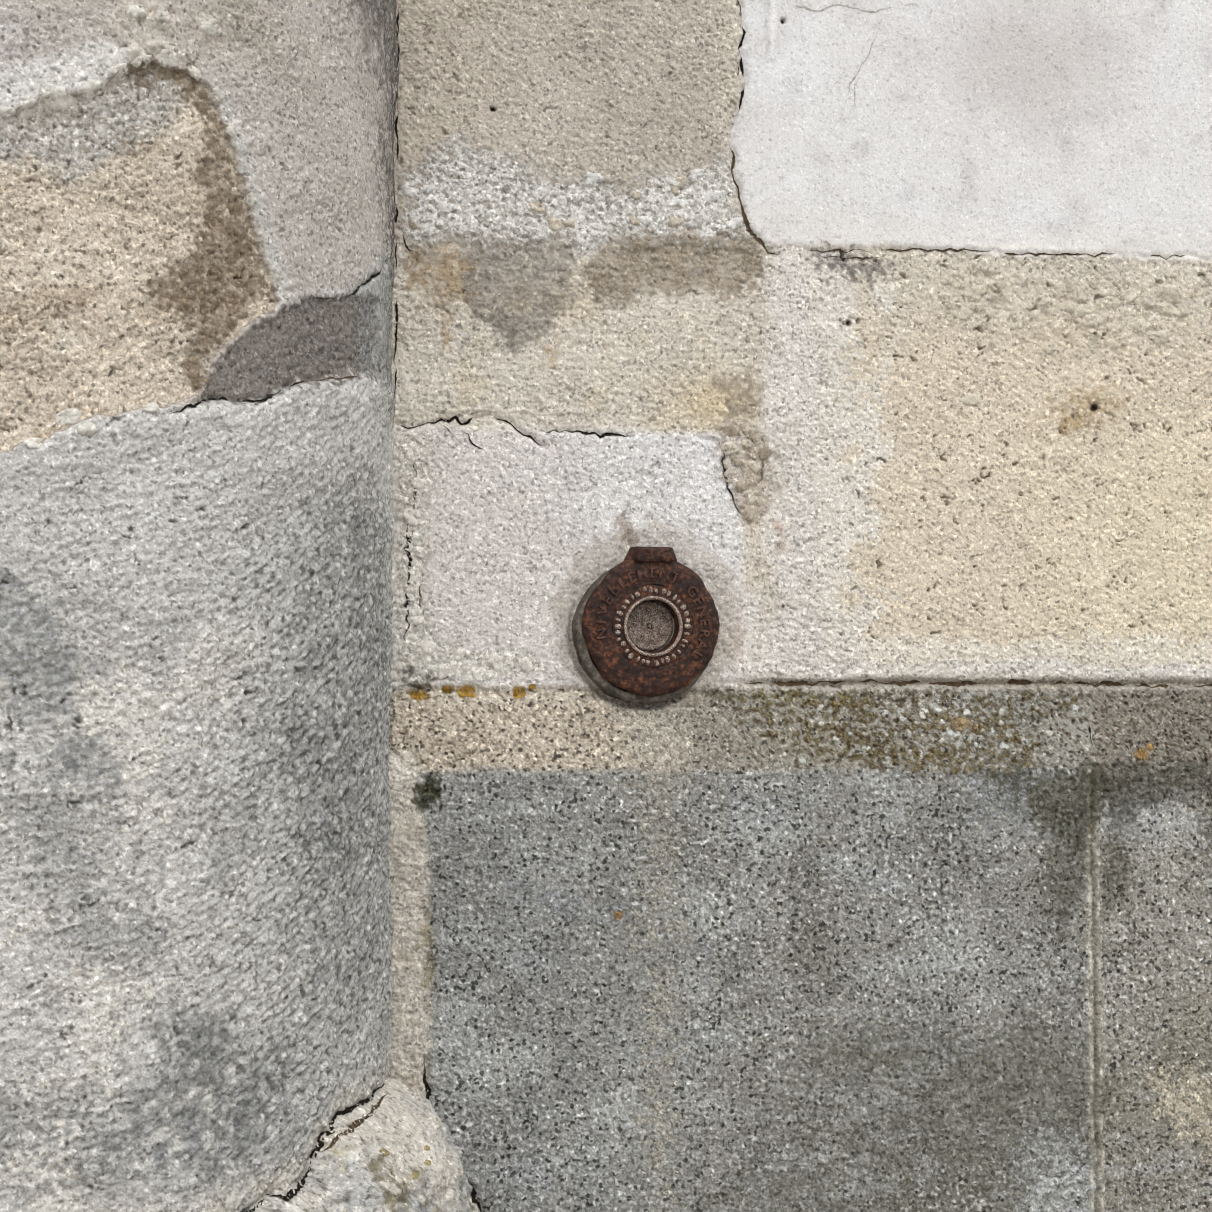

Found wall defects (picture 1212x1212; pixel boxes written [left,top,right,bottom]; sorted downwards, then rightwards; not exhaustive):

crack [795,3,920,113]
spalling [0,49,280,452]
crack [308,1,629,451]
water stain [461,218,764,354]
crack [170,375,359,414]
water stain [712,372,763,412]
crack [403,460,424,641]
crack [246,1084,386,1212]